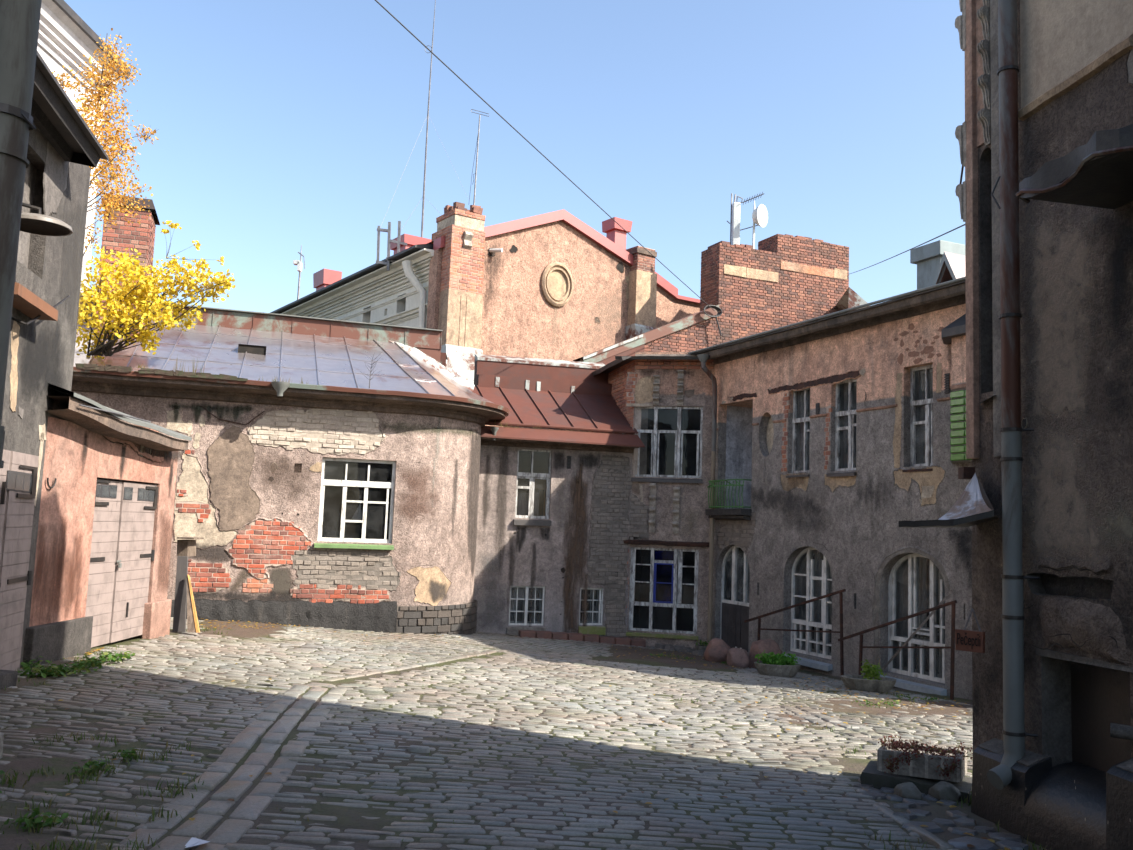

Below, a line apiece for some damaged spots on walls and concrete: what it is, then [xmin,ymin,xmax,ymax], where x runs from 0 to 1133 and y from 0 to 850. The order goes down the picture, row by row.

leakage [195,406,241,423]
flaking render [165,408,452,606]
leakage [563,464,588,633]
flaking render [780,393,858,493]
flaking render [892,323,946,506]